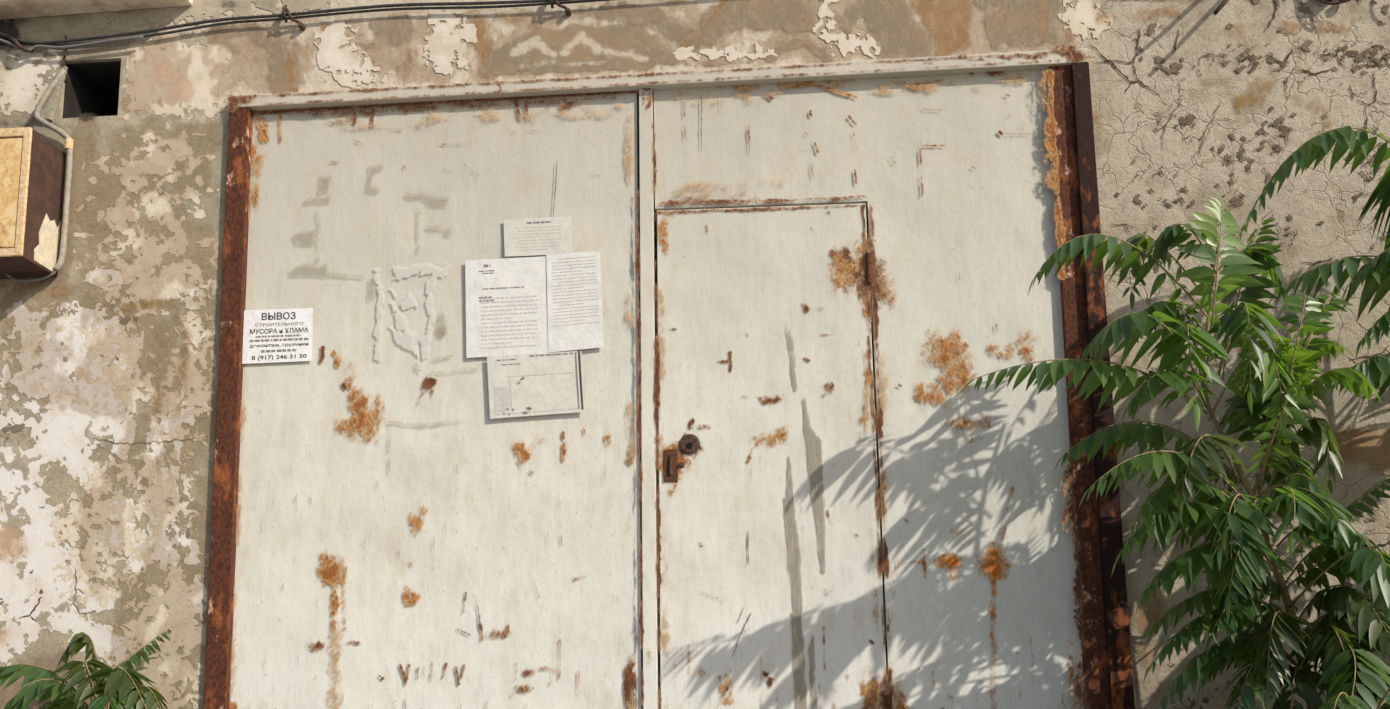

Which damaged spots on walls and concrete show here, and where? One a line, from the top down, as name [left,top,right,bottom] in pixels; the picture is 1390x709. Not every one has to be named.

peeling [423,6,477,78]
peeling [673,42,778,62]
peeling [812,0,881,58]
peeling [1058,0,1114,40]
crack [1089,0,1390,154]
peeling [0,0,387,709]
rust [224,44,1092,709]